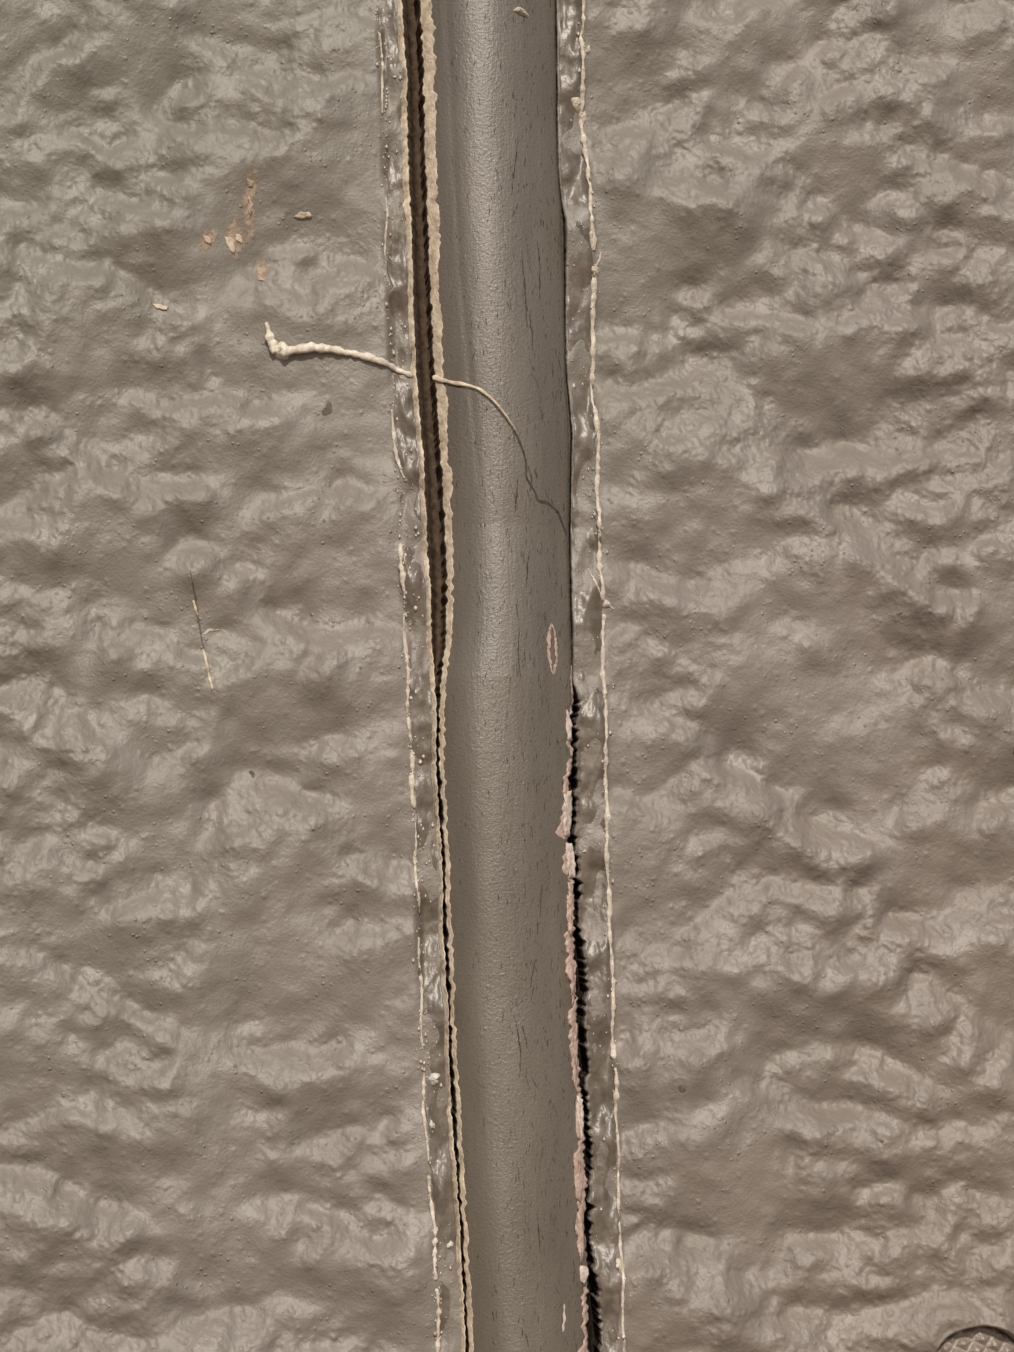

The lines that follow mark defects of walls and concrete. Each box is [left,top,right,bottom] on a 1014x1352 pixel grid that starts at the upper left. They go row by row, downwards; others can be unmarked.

crack [401,0,600,1352]
peeling [546,623,589,1352]